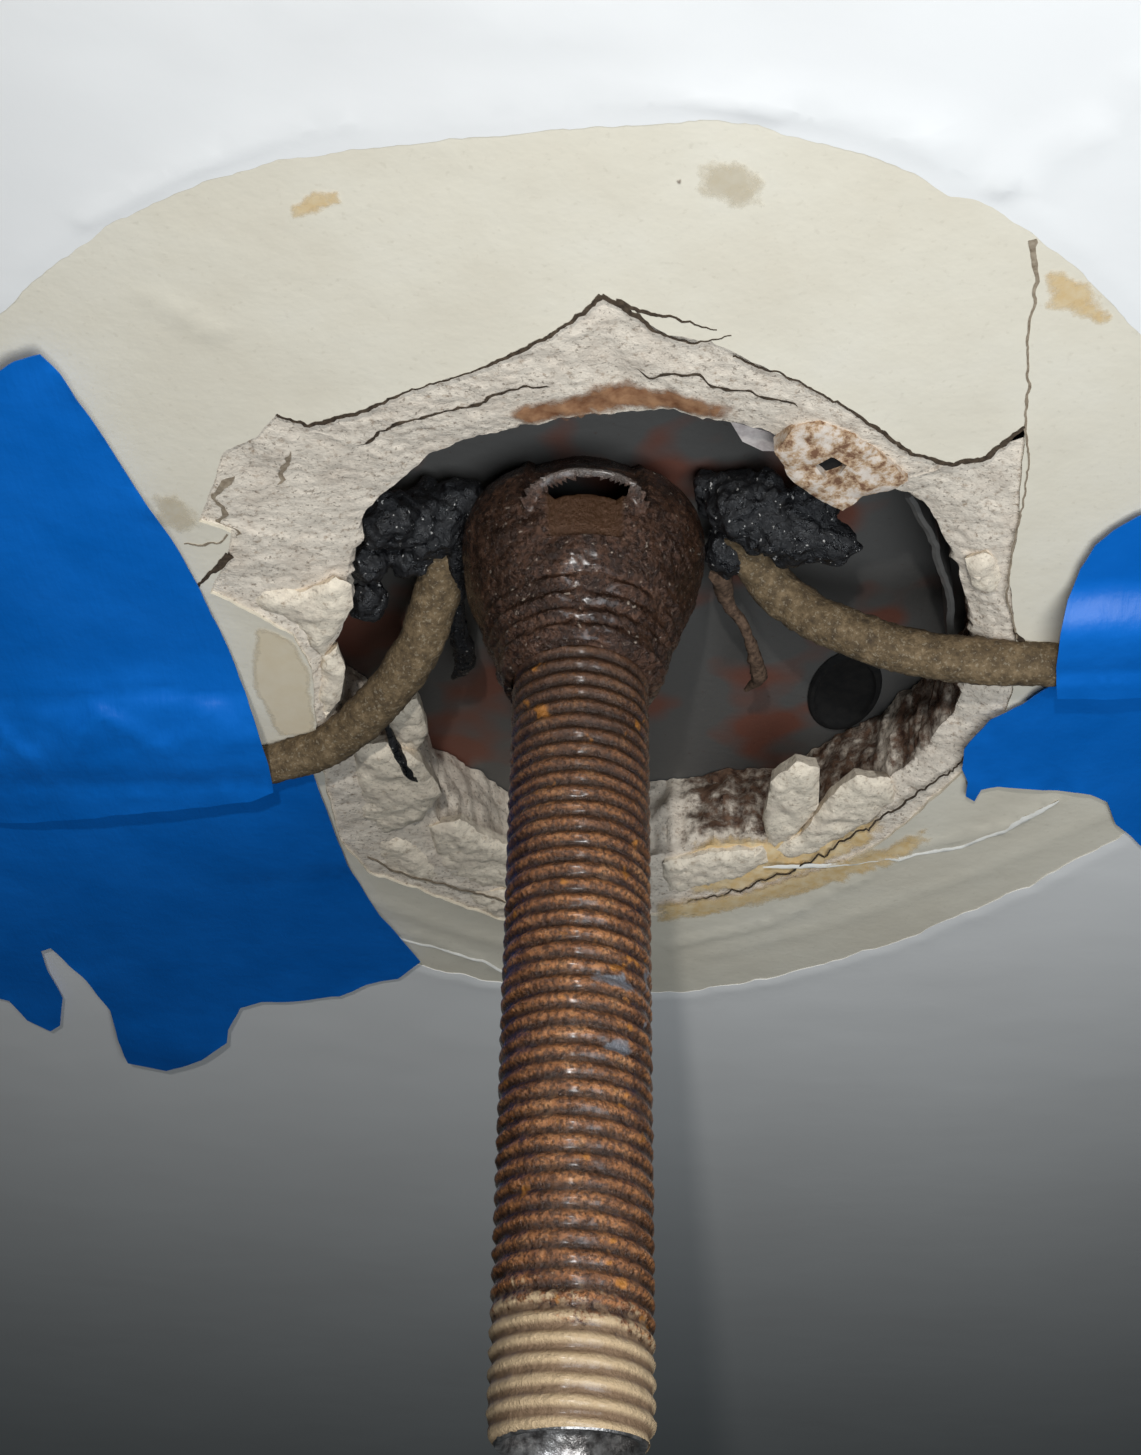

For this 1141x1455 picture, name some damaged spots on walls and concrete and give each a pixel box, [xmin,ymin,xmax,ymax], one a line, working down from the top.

damp [293,194,338,216]
crack [184,476,241,587]
peeling [0,120,1141,746]
rust [514,384,724,423]
crack [276,239,1040,642]
spalling [314,692,509,982]
peeling [649,679,1125,992]